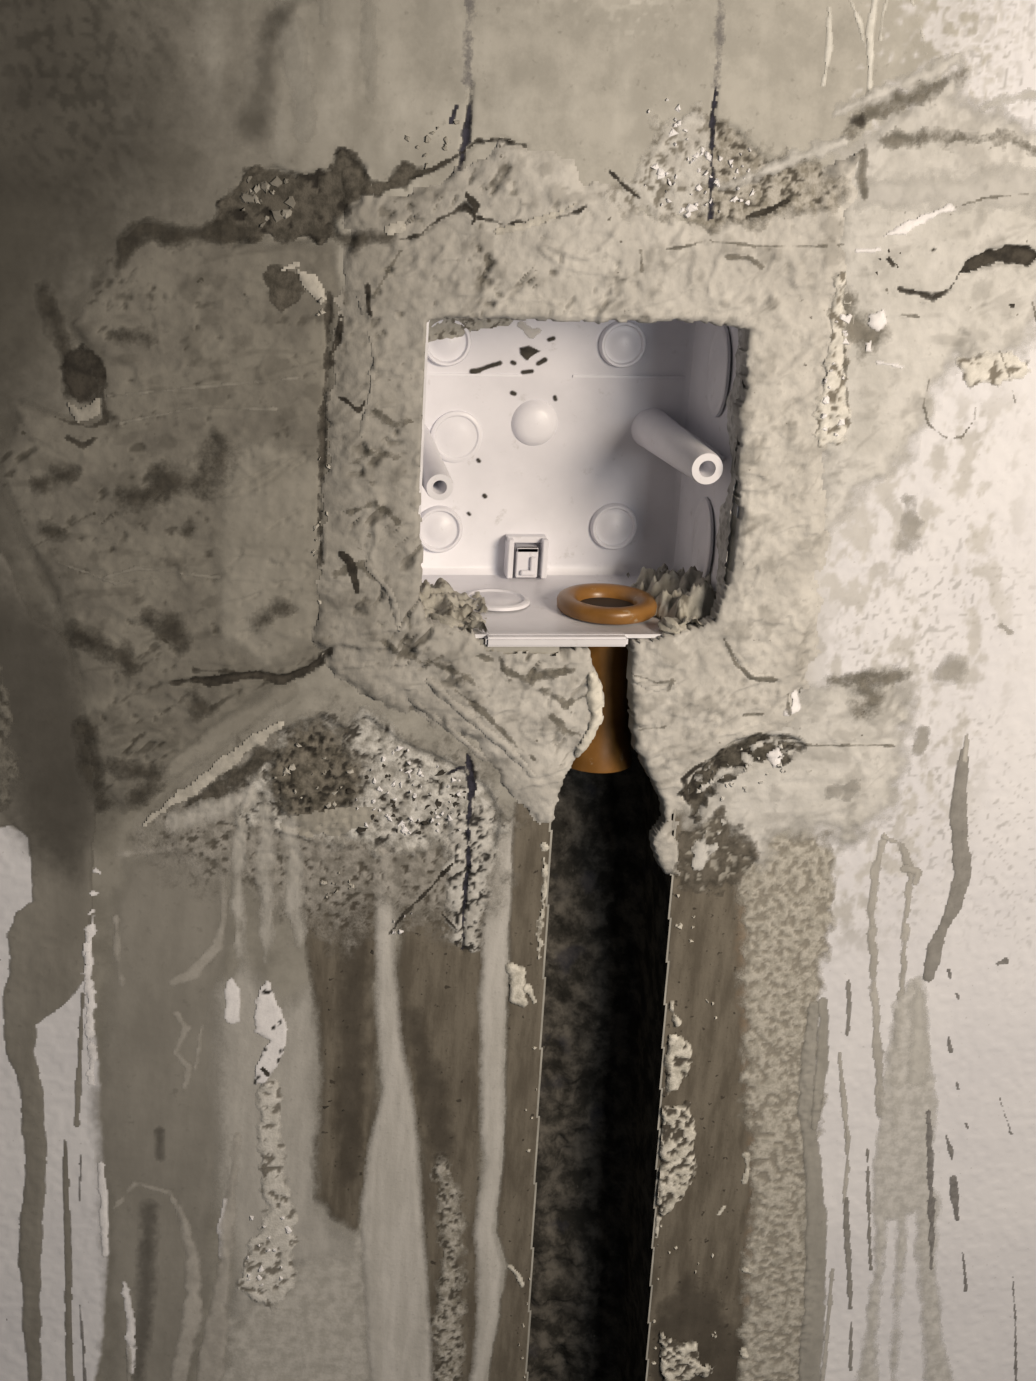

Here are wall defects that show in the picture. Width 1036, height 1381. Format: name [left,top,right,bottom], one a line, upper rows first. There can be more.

peeling [65,383,100,423]
spalling [117,147,394,265]
crack [312,103,587,594]
spalling [609,98,849,234]
damp [0,553,101,1381]
damp [97,850,379,1381]
spalling [139,706,511,957]
damp [394,902,486,1381]
spalling [676,732,849,898]
damp [811,997,873,1381]
damp [909,734,972,1085]
damp [926,1110,960,1270]